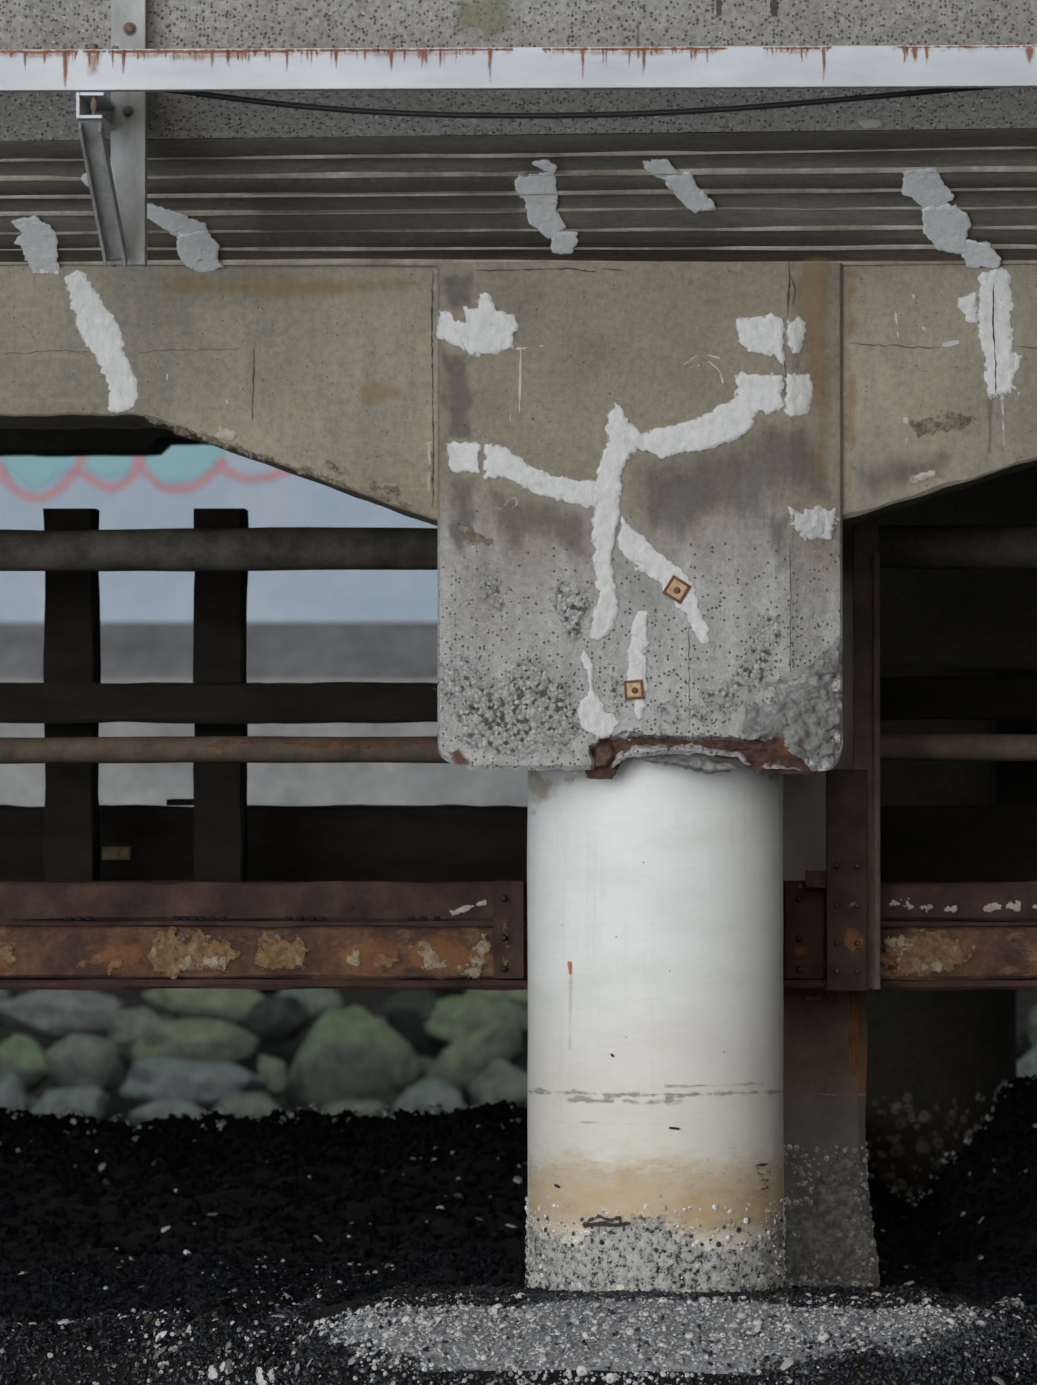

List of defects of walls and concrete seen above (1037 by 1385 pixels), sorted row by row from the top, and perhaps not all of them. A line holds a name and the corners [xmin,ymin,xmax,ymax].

corrosion [0,48,513,84]
corrosion [542,47,727,75]
corrosion [763,46,832,72]
corrosion [897,46,1037,62]
water stain [510,345,544,423]
spalling [910,470,936,483]